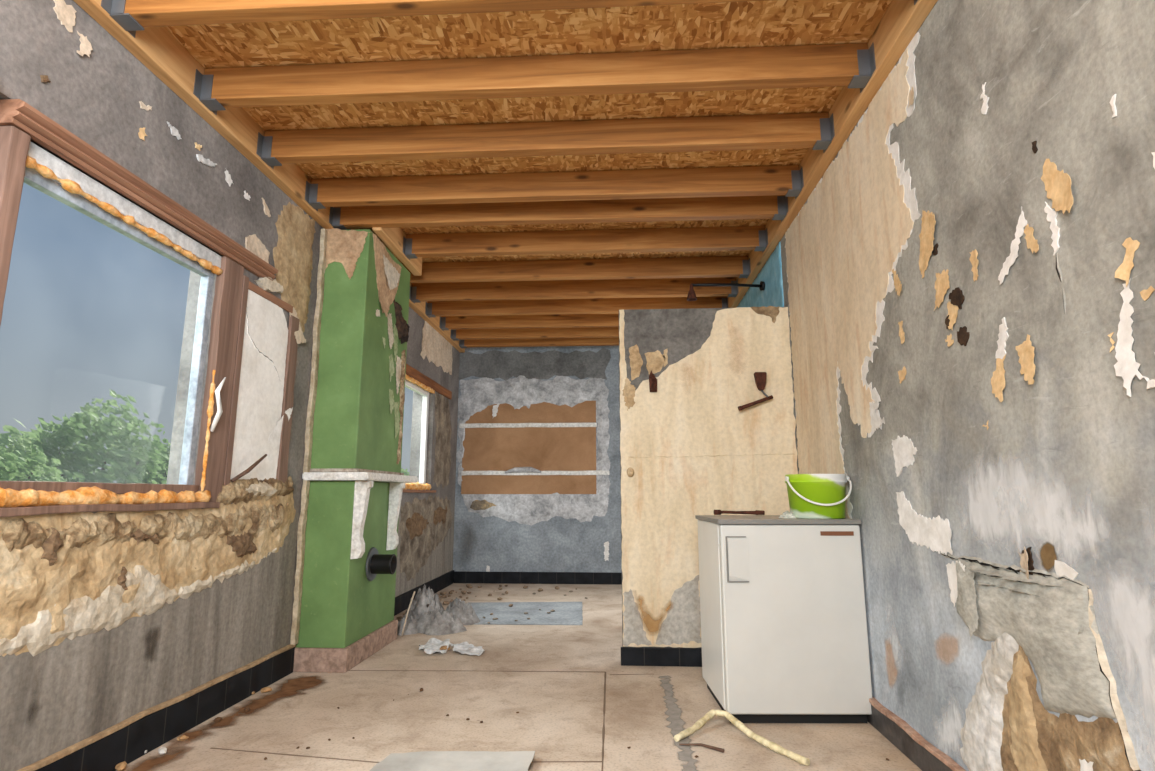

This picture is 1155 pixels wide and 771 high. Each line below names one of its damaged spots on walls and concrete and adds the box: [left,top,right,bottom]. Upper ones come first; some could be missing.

peeling [53,0,93,57]
peeling [195,142,233,186]
peeling [244,191,316,344]
peeling [919,210,970,347]
peeling [998,141,1073,284]
peeling [1108,237,1155,397]
peeling [376,299,611,581]
peeling [891,435,918,477]
flaking render [0,476,296,657]
peeling [623,575,701,647]
peeling [896,491,966,607]
flaking render [960,632,1141,771]